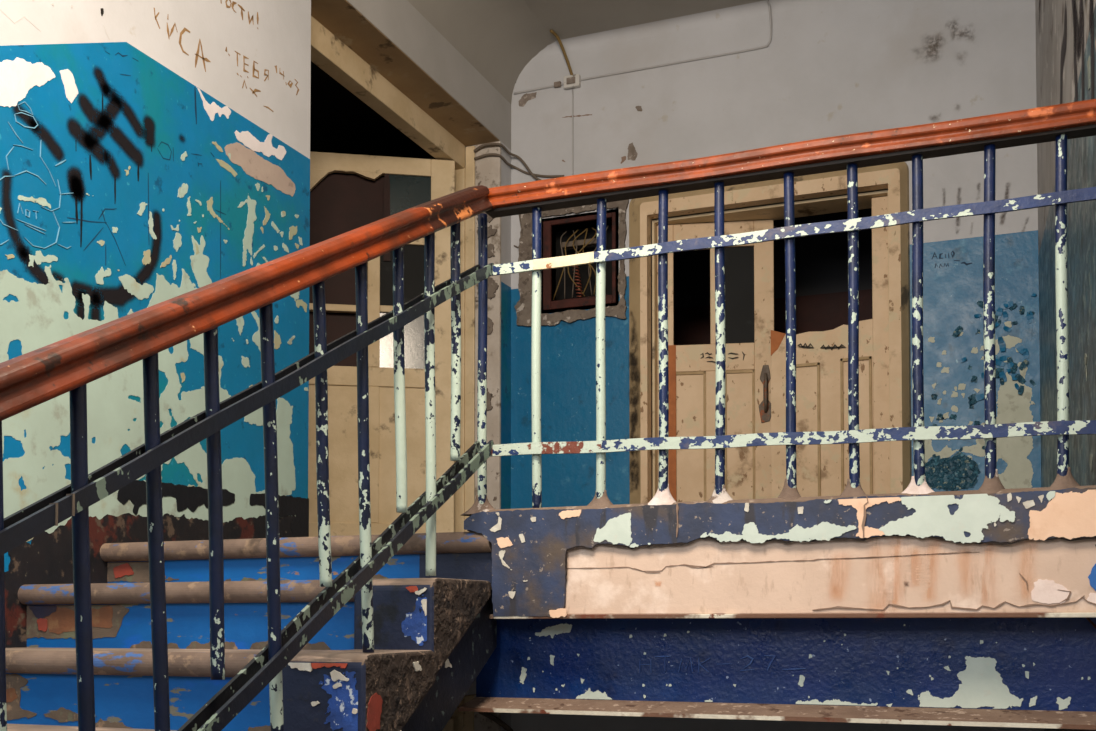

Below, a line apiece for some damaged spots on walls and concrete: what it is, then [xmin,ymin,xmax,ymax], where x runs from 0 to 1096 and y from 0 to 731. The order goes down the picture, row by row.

peeling [0,57,78,108]
flaking render [212,130,303,267]
peeling [0,183,230,363]
flaking render [515,200,629,327]
peeling [2,392,71,518]
peeling [87,360,145,474]
peeling [158,333,205,434]
peeling [222,457,266,522]
peeling [276,397,296,496]
peeling [700,436,1096,544]
crack [814,573,1096,611]
peeling [793,656,1037,709]